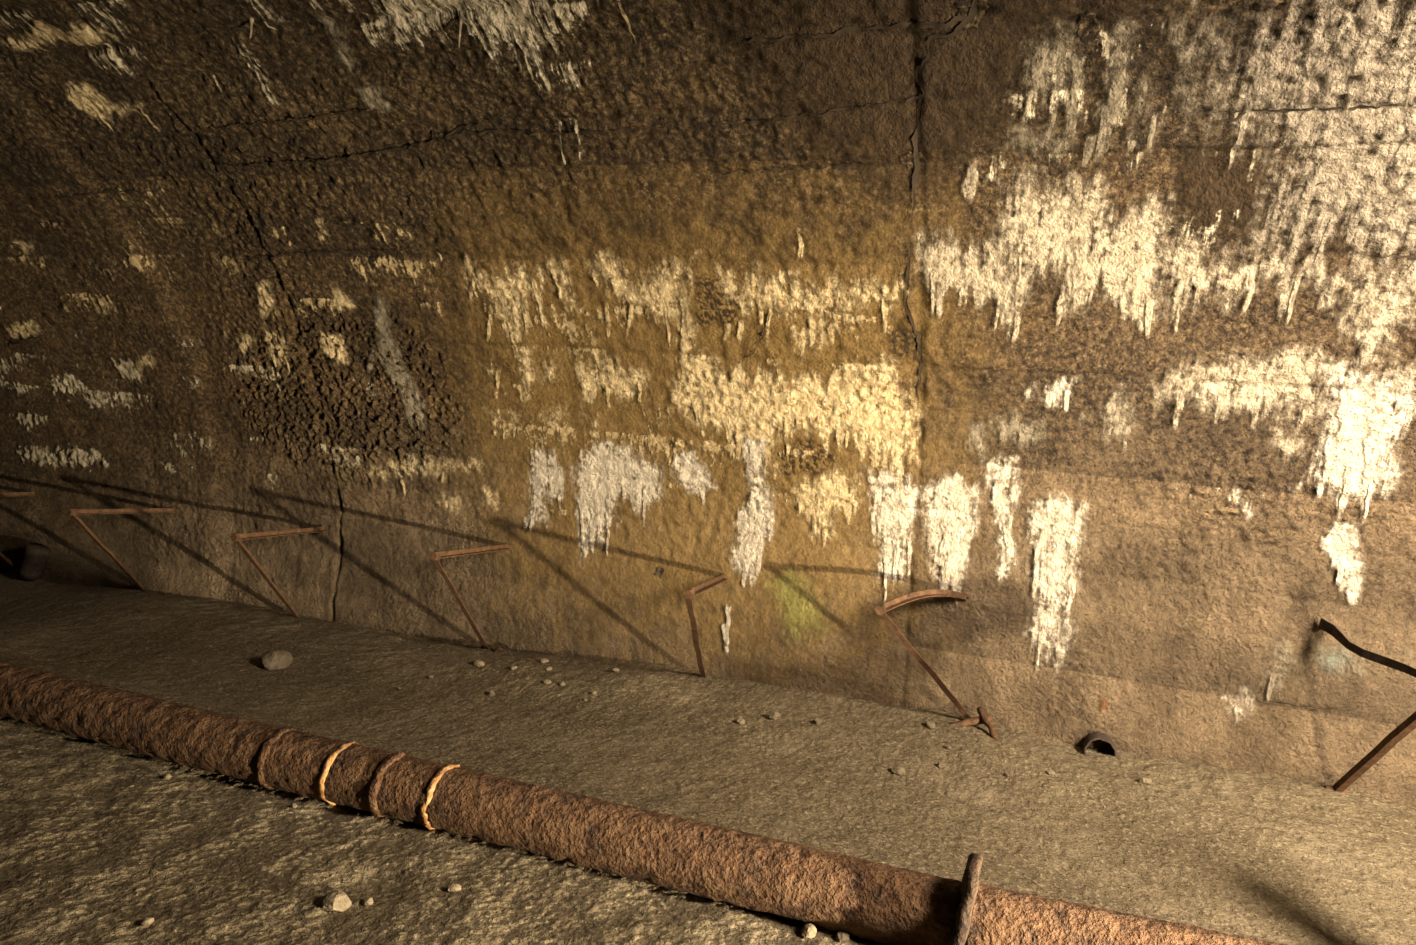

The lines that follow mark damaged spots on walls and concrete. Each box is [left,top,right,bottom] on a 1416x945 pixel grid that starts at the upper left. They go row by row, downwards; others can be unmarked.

damp [375,0,559,88]
damp [332,287,356,311]
damp [464,258,576,398]
damp [707,0,1416,605]
damp [576,352,648,407]
damp [492,410,518,439]
damp [525,421,711,557]
damp [592,229,1087,667]
damp [1226,642,1296,720]